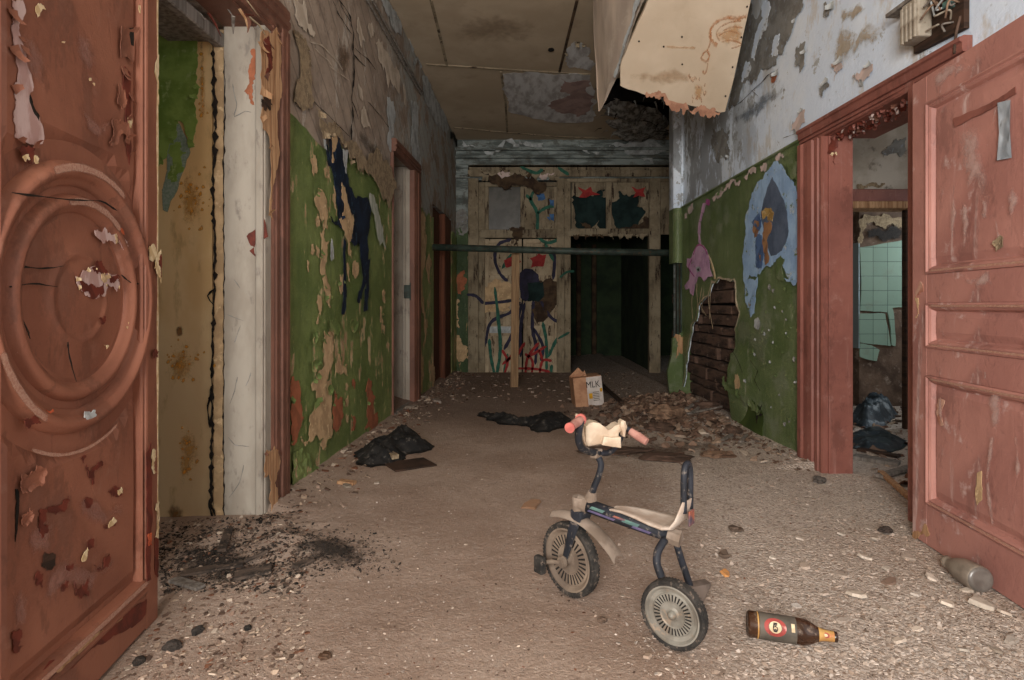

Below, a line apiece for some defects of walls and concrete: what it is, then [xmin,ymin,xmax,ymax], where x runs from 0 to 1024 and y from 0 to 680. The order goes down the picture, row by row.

flaking render [294,0,315,37]
flaking render [823,1,834,17]
flaking render [728,0,805,110]
flaking render [819,56,873,98]
flaking render [711,128,730,163]
peeling [827,98,908,164]
peeling [712,153,784,201]
peeling [264,17,422,456]
peeling [857,213,902,244]
flaking render [672,276,796,412]
peeling [738,394,796,436]